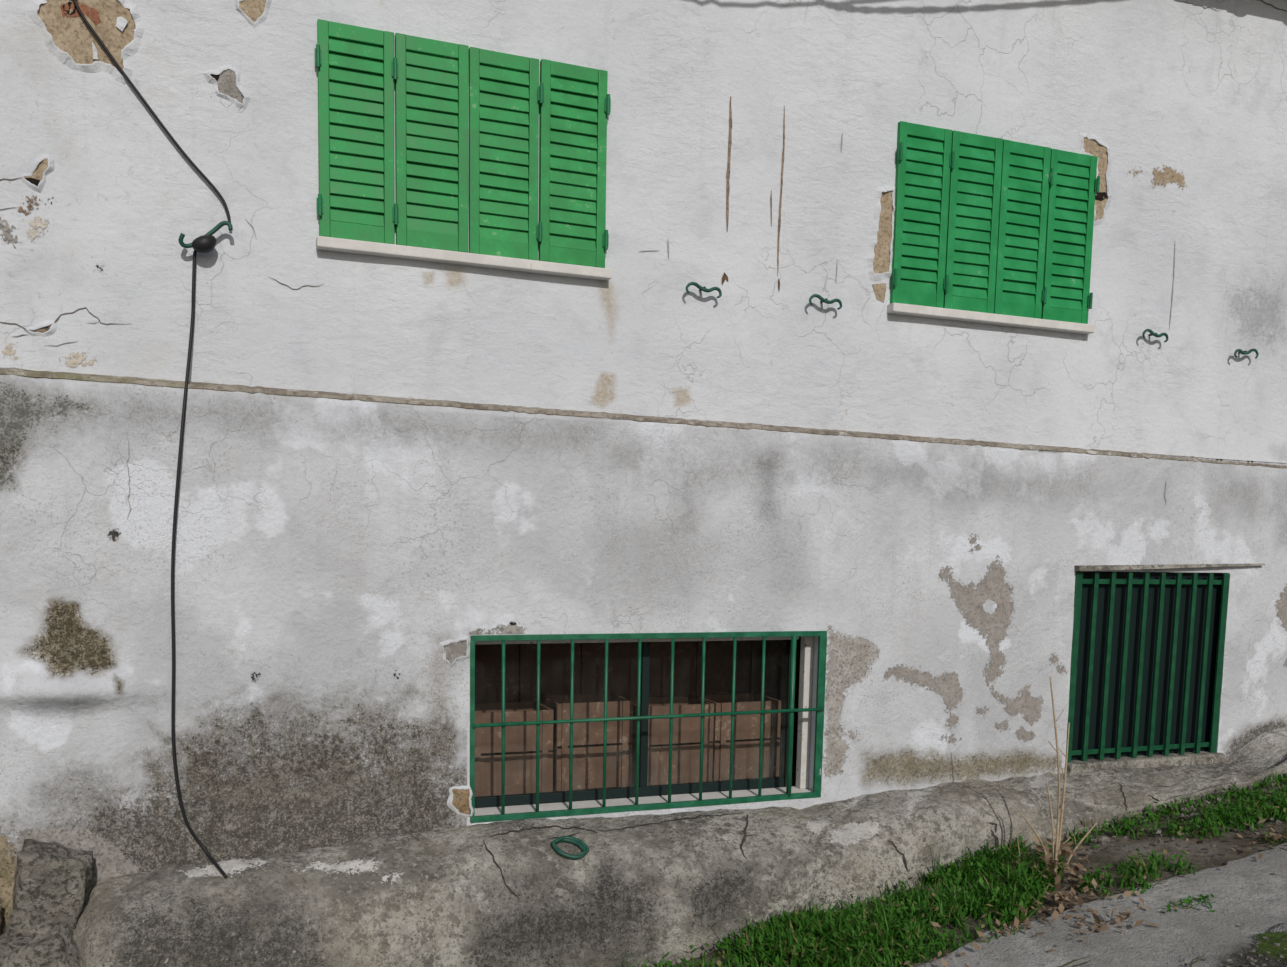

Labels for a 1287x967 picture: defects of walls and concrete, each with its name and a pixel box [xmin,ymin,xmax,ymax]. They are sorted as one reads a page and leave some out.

spalling [27,0,144,85]
spalling [235,0,272,28]
spalling [1079,132,1111,226]
spalling [1127,165,1187,190]
spalling [867,184,895,302]
crack [0,307,116,346]
damp [0,381,93,489]
spalling [27,597,122,694]
peeling [938,555,1045,742]
peeling [822,623,965,778]
damp [1,690,467,872]
damp [77,885,337,967]